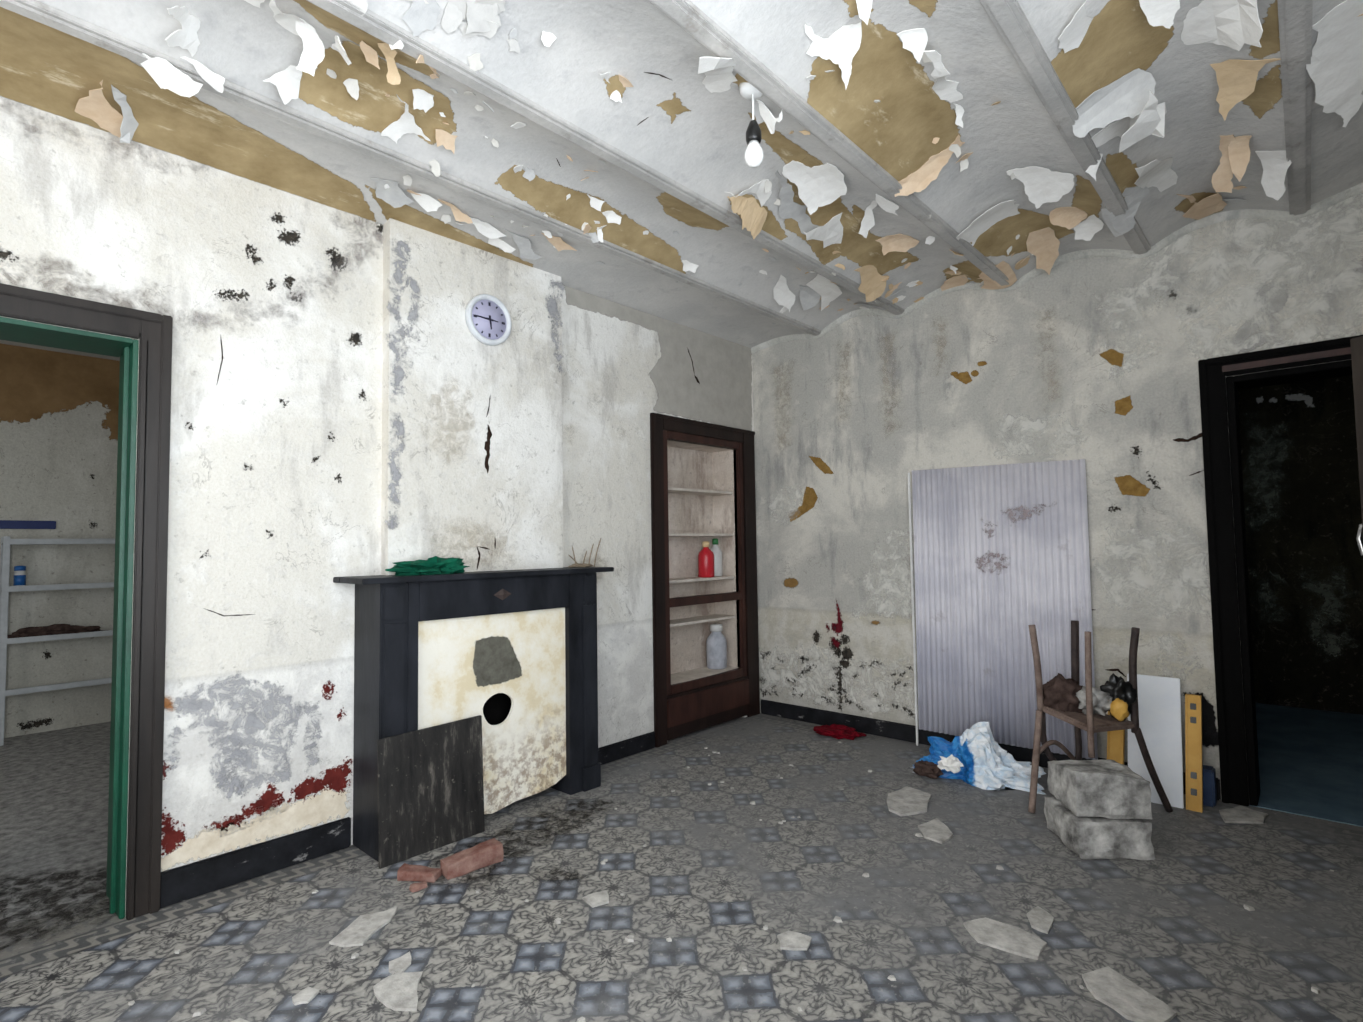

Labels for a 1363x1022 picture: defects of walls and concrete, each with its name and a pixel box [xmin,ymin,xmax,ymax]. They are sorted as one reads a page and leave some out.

damp [242,244,264,265]
damp [214,275,303,302]
damp [271,212,301,246]
damp [325,247,362,286]
damp [346,332,362,346]
peeling [387,241,420,394]
peeling [0,0,973,326]
peeling [941,0,1363,375]
peeling [0,343,120,441]
flaking render [1115,475,1150,497]
damp [760,623,915,716]
flaking render [161,674,353,872]